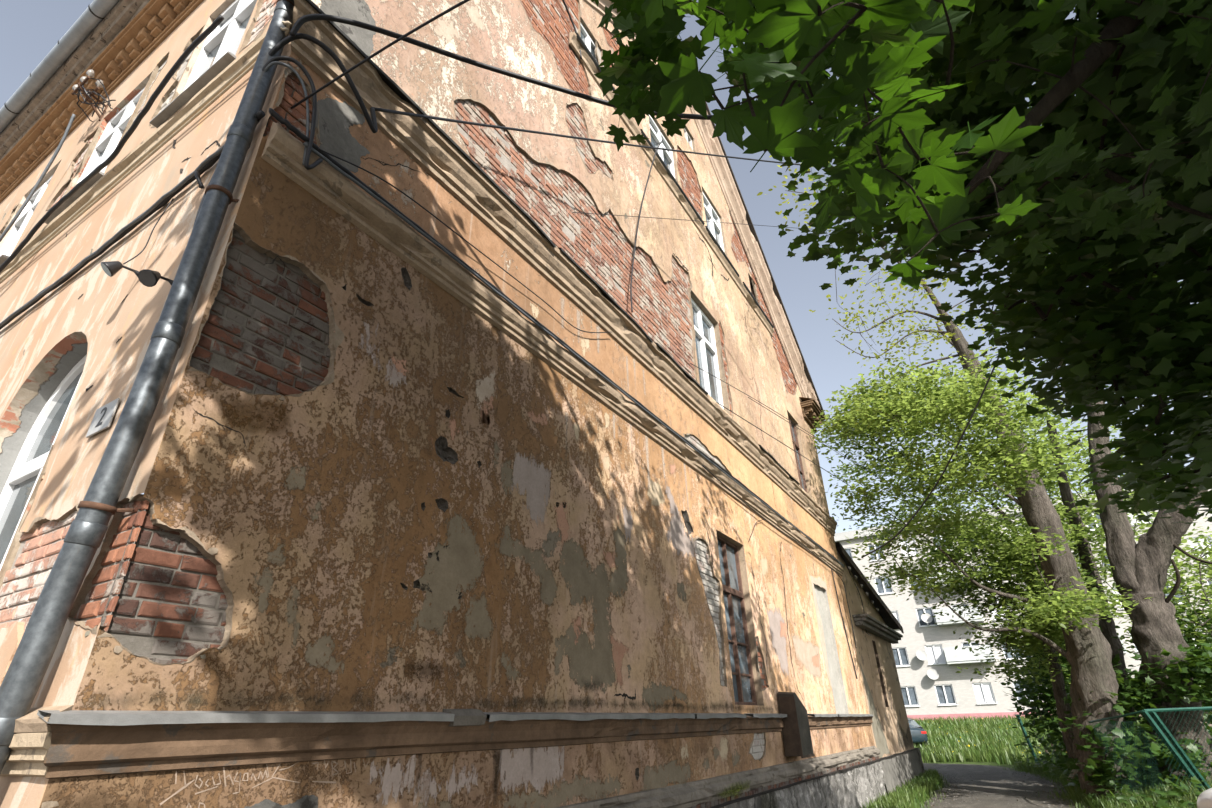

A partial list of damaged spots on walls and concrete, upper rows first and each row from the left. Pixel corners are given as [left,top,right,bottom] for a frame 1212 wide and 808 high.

flaking render [320,0,397,56]
peeling [433,5,486,43]
flaking render [453,0,697,381]
flaking render [673,145,703,218]
flaking render [188,224,409,401]
flaking render [0,445,79,630]
flaking render [68,494,234,665]
flaking render [400,498,494,641]
peeling [511,452,567,526]
flaking render [554,503,633,694]
flaking render [647,463,727,687]
flaking render [244,795,318,808]